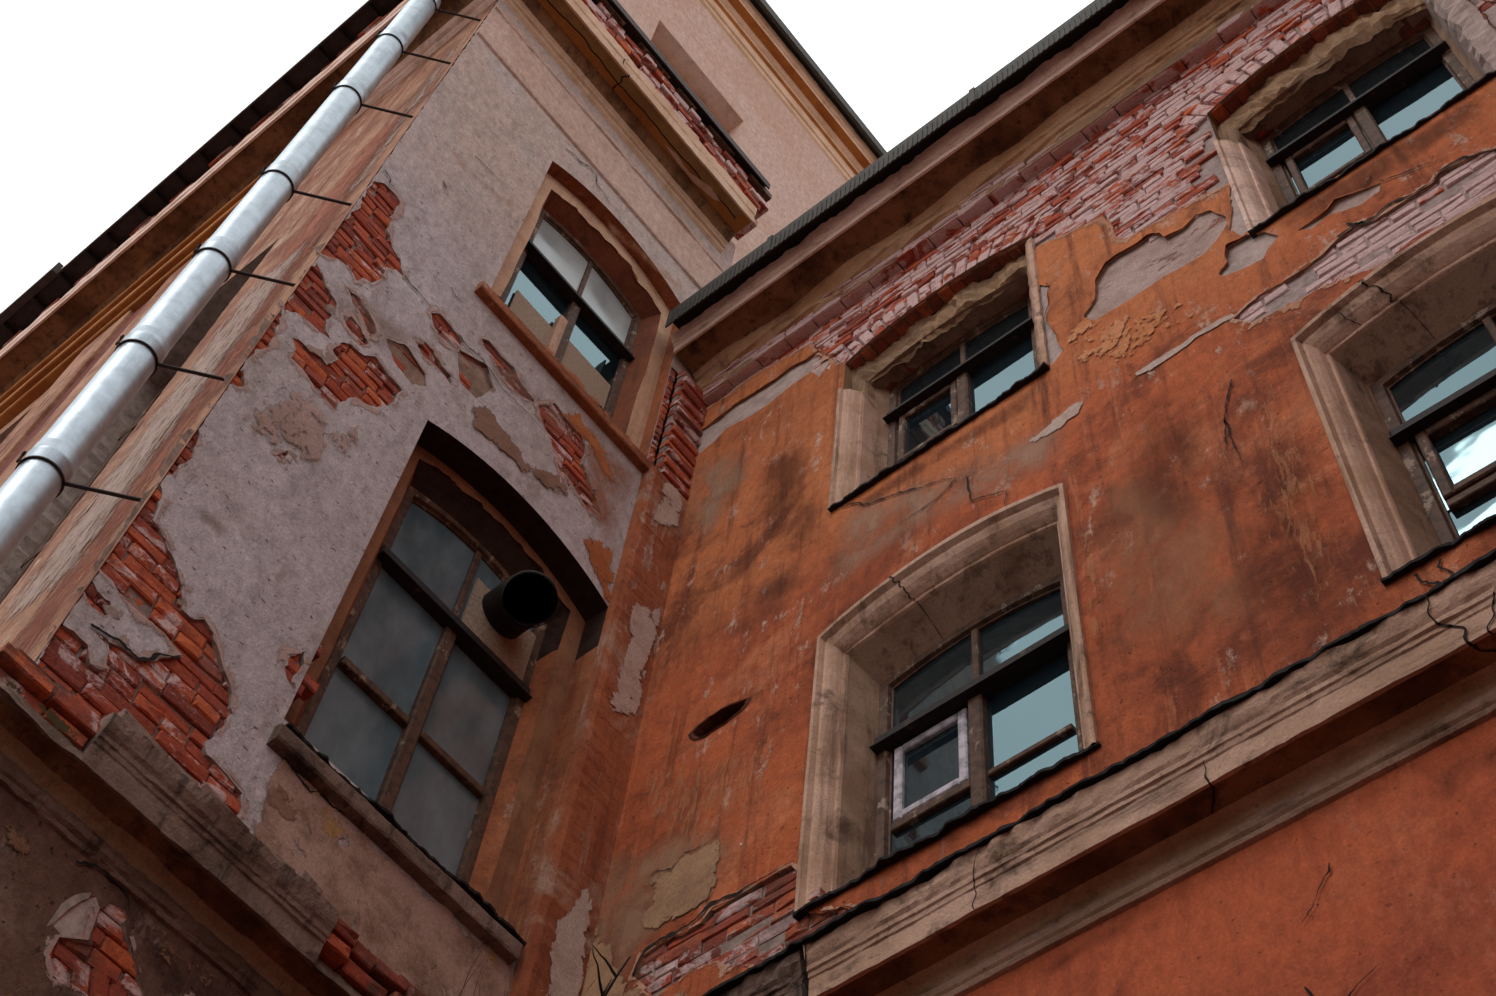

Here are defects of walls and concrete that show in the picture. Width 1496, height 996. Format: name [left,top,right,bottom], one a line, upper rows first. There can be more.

flaking render [648,0,1496,527]
flaking render [0,41,602,996]
peeling [609,603,661,717]
spalling [688,697,751,741]
crack [1413,559,1496,652]
flaking render [541,839,857,996]